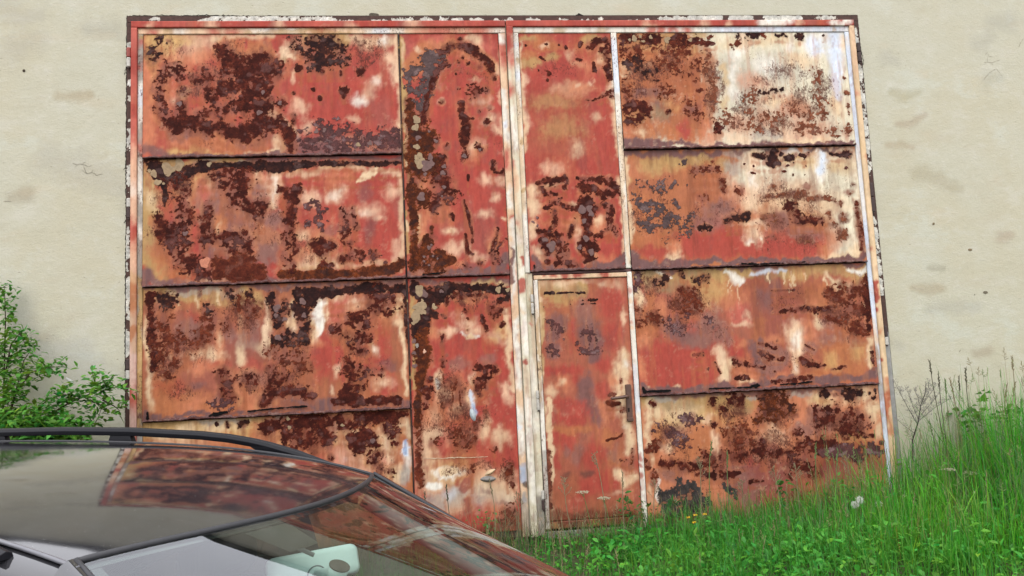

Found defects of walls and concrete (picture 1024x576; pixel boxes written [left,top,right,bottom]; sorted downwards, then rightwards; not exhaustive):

corrosion [585,33,853,138]
corrosion [752,148,809,169]
corrosion [143,34,510,489]
corrosion [633,270,714,337]
corrosion [531,158,864,268]
corrosion [504,462,515,489]
corrosion [619,341,885,522]